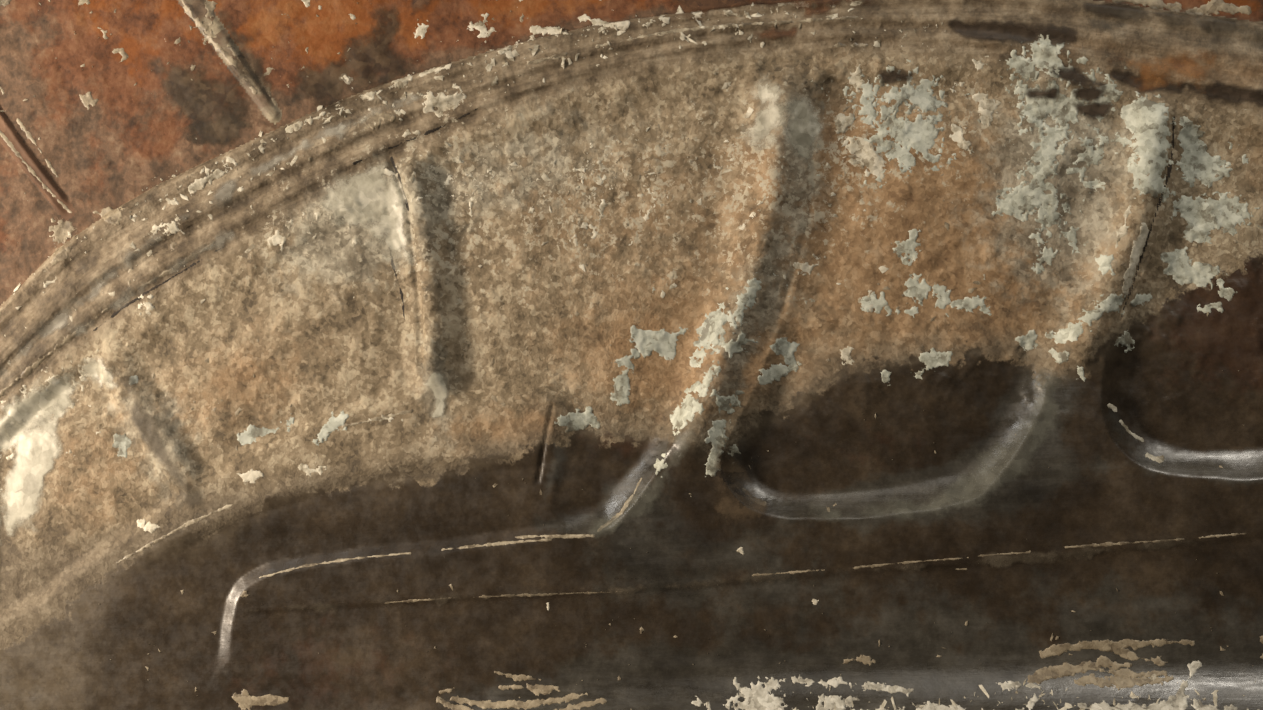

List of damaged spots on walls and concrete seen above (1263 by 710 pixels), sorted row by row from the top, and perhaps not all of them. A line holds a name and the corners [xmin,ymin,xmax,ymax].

corrosion [679,0,855,17]
corrosion [948,20,1077,44]
corrosion [879,71,911,83]
corrosion [1026,54,1263,118]
crack [1121,116,1175,317]
crack [389,248,405,320]
leakage [0,232,233,535]
corrosion [133,408,200,505]
leakage [442,478,642,551]
leakage [259,552,411,578]
leakage [436,671,608,710]
leakage [1027,639,1195,690]